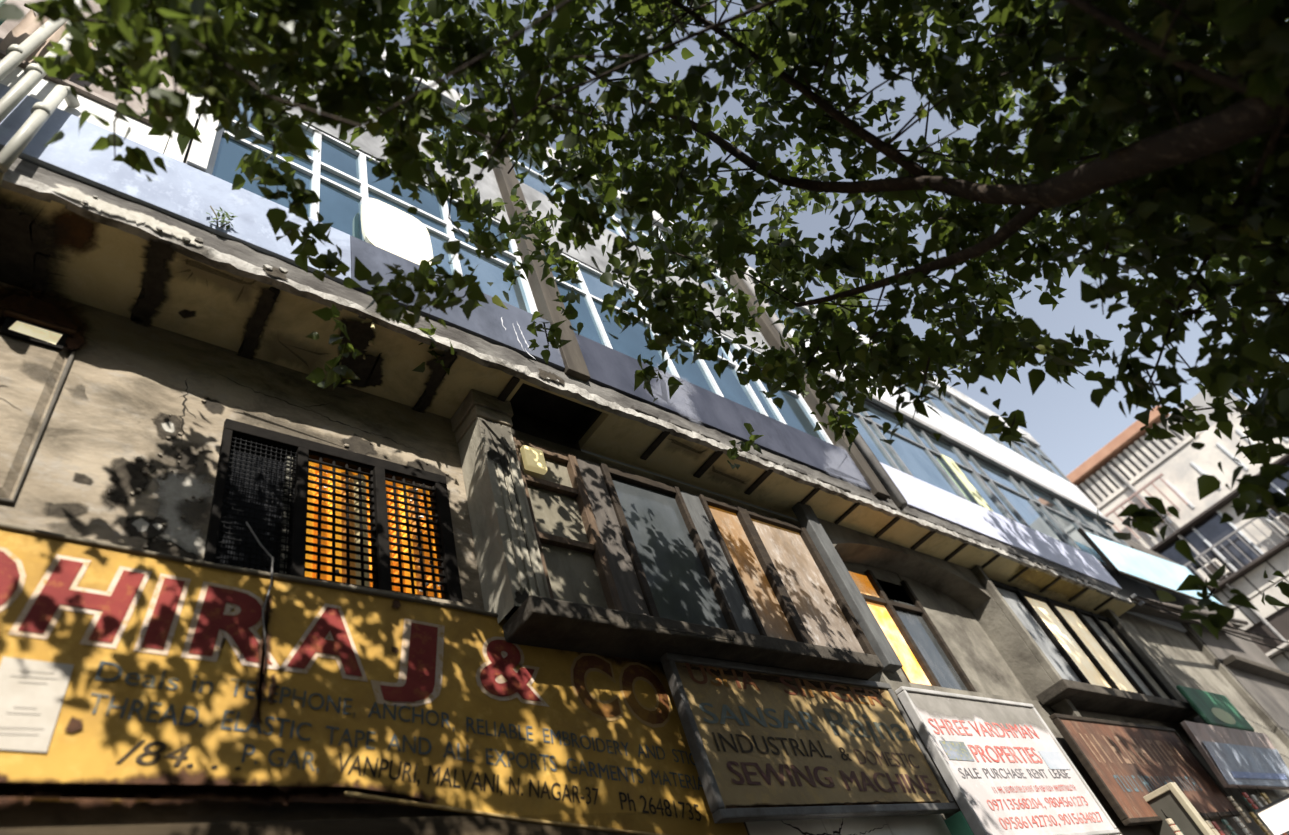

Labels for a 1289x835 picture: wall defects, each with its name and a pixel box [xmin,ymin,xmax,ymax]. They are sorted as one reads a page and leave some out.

water stain [0,199,67,298]
water stain [129,239,176,326]
water stain [179,309,196,318]
water stain [238,288,277,360]
peeling [73,413,213,560]